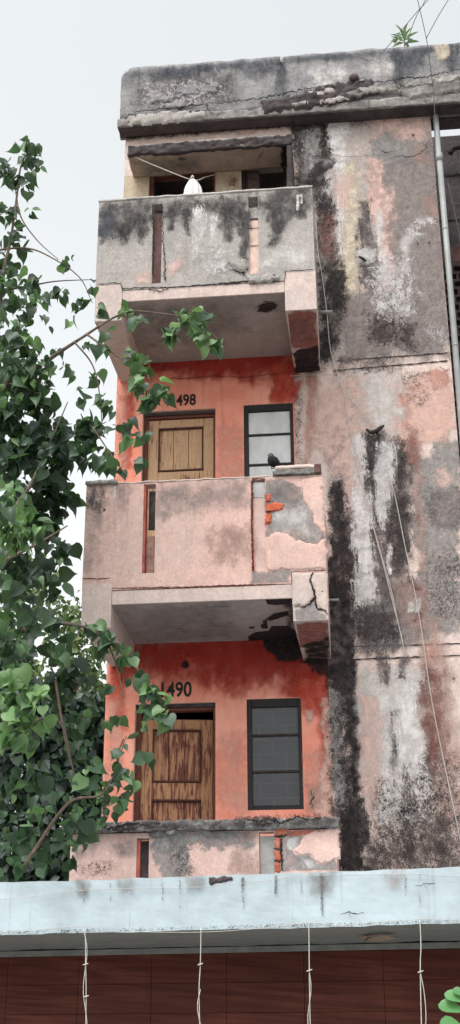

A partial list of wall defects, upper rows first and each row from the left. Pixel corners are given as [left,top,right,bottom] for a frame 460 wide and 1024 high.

spalling [261,73,460,114]
damp [98,122,424,403]
crack [82,477,328,614]
damp [94,367,460,871]
peeling [251,464,329,620]
peeling [274,698,341,873]